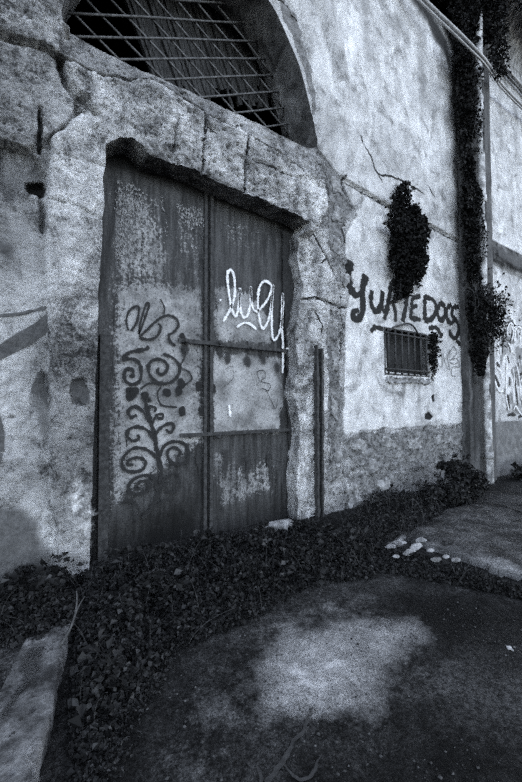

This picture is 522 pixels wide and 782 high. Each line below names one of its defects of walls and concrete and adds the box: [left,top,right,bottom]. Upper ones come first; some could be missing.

crack [36,110,44,155]
crack [202,115,292,193]
crack [341,135,435,208]
rust [275,231,294,377]
rust [217,346,231,364]
spalling [327,325,463,509]